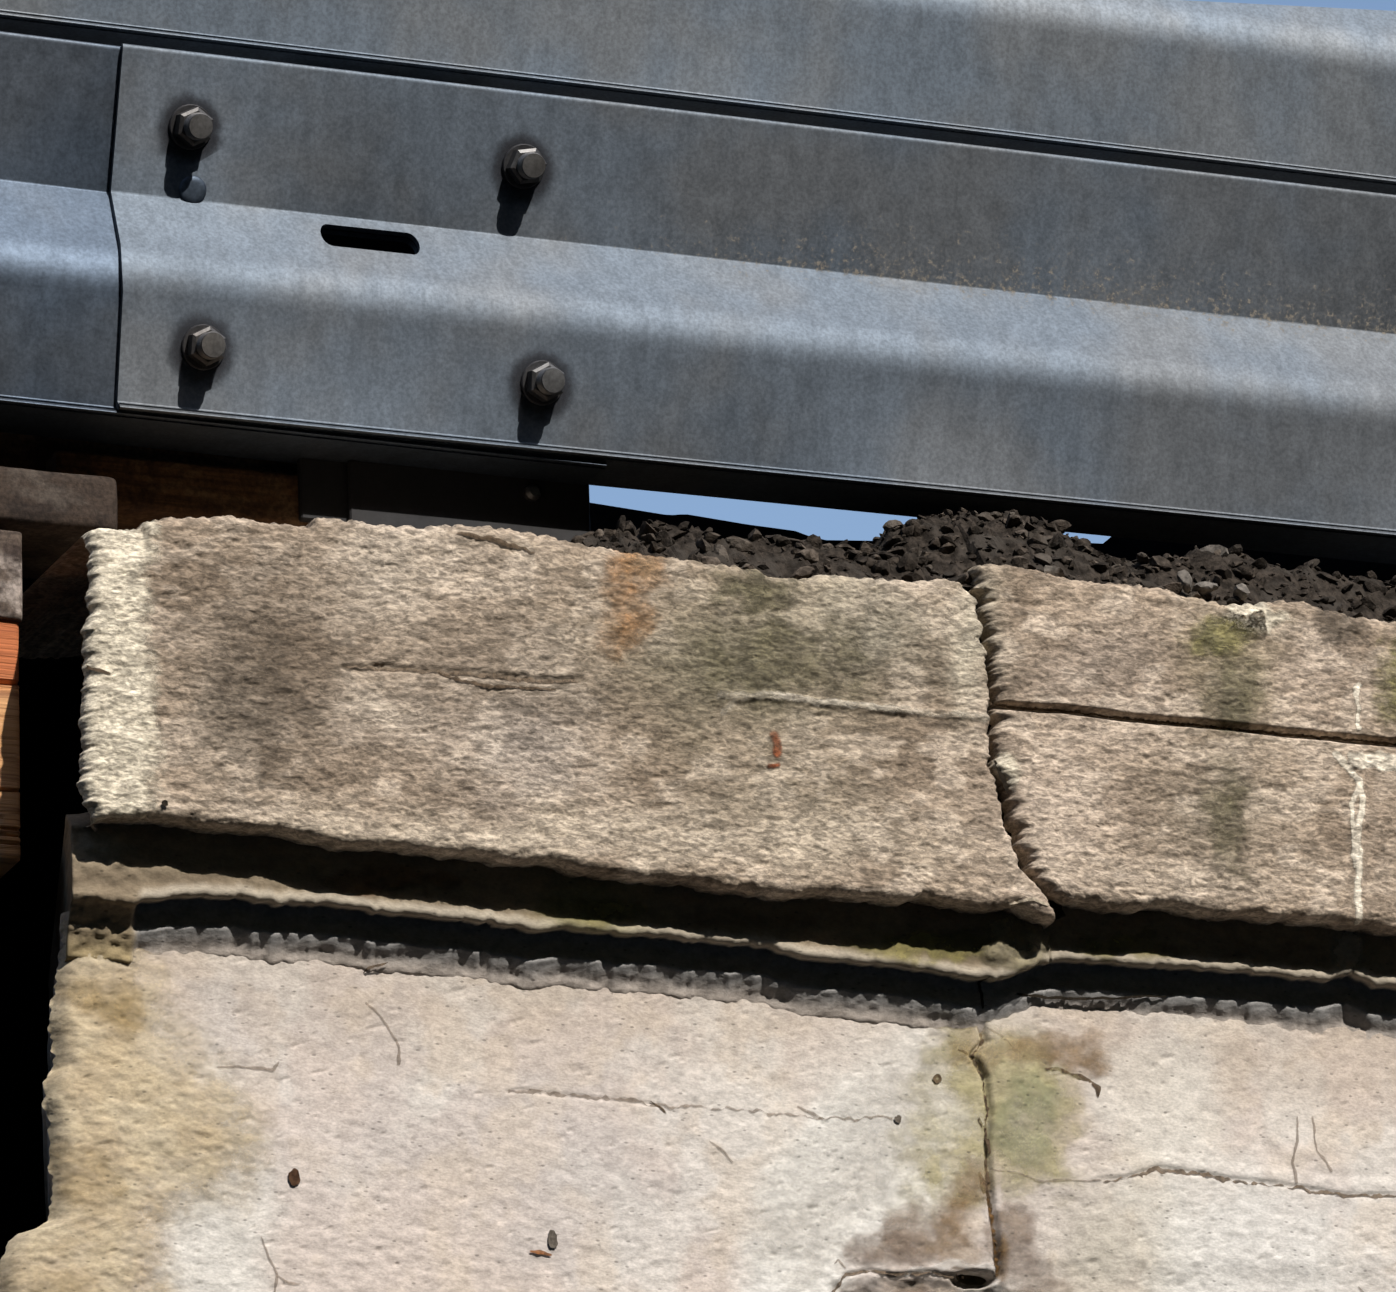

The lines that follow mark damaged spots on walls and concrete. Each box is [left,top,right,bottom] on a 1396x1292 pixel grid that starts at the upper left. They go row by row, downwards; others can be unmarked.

rust [611,553,660,579]
water stain [1221,602,1288,636]
water stain [1217,661,1257,726]
efflorescence [1353,682,1362,730]
crack [987,702,1396,869]
efflorescence [1332,751,1396,972]
crack [1048,900,1065,920]
crack [832,977,1166,1292]
water stain [923,1034,1104,1204]
crack [1104,1166,1396,1199]
water stain [992,1207,1032,1260]
water stain [906,1260,961,1276]